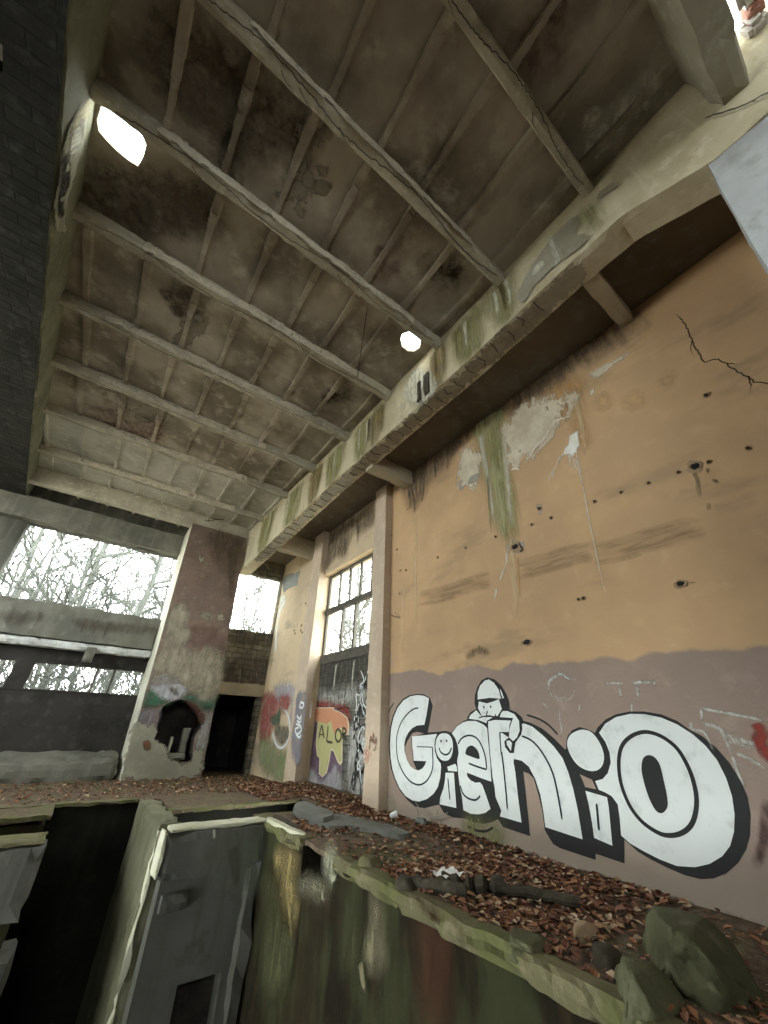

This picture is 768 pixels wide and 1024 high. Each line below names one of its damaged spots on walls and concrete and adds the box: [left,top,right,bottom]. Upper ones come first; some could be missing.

crack [704,71,768,119]
water stain [286,448,339,518]
water stain [326,510,374,568]
spalling [255,217,590,561]
water stain [403,320,625,597]
peeling [501,353,629,471]
crack [676,314,768,394]
peeling [117,602,223,781]